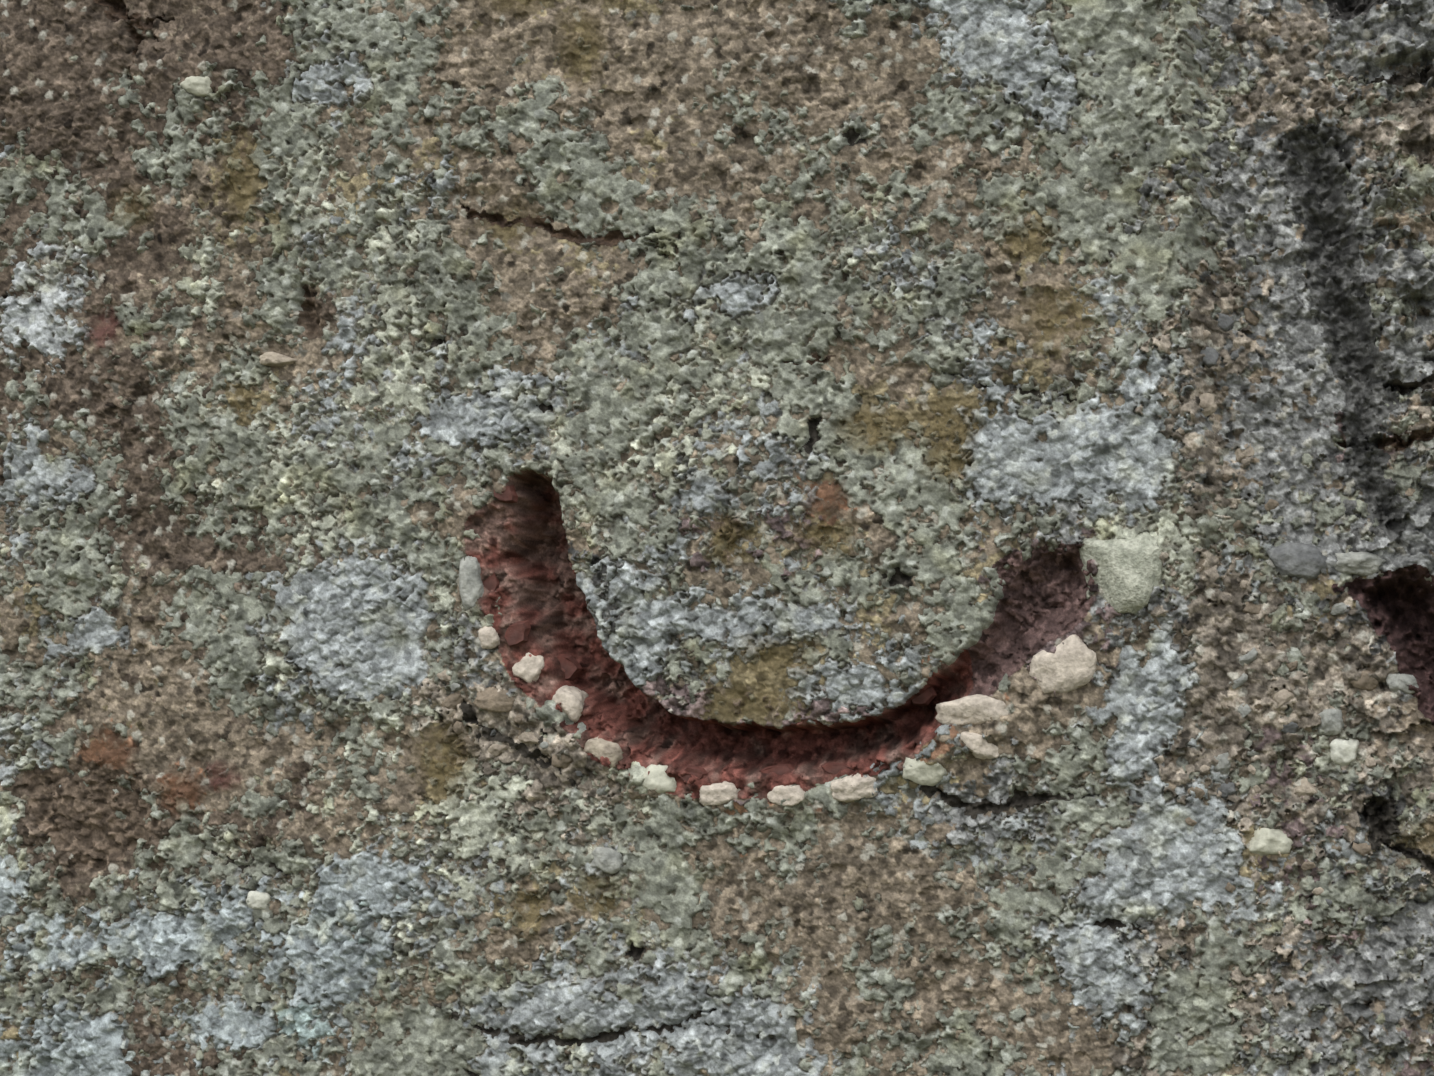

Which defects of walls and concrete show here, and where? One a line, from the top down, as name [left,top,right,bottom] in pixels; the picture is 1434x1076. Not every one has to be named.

spalling [882,567,913,587]
spalling [1332,564,1434,725]